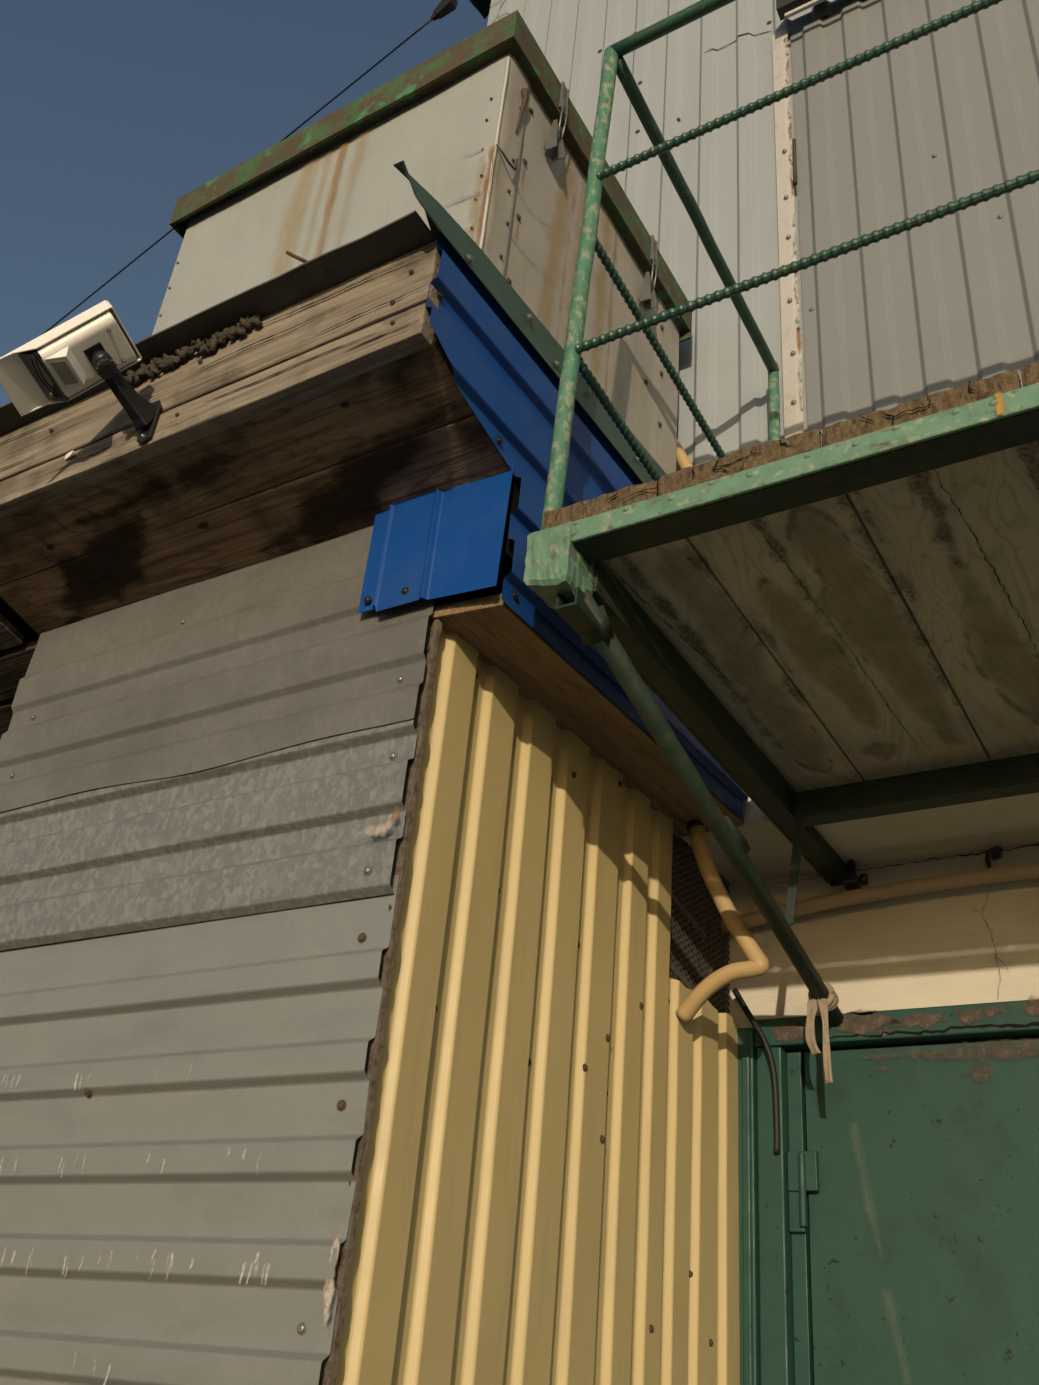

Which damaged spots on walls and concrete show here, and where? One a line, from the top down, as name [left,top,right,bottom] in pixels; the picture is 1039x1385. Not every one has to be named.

rust [325,140,347,217]
rust [478,146,494,234]
water stain [57,455,229,625]
water stain [261,403,457,552]
crack [822,844,1039,1041]